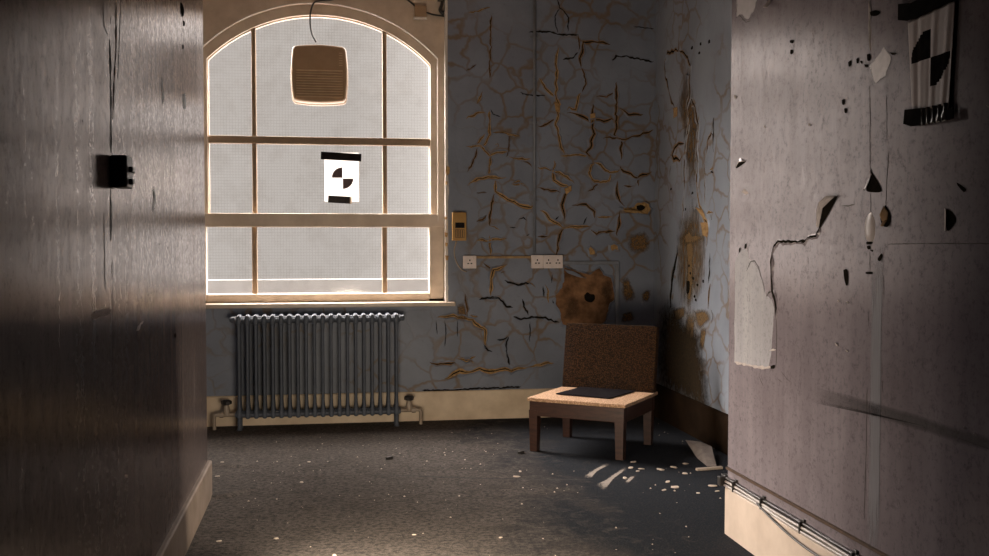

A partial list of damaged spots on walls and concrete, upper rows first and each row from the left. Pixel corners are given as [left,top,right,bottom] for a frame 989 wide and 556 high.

crack [422,0,716,391]
spalling [553,266,616,328]
peeling [733,244,776,371]